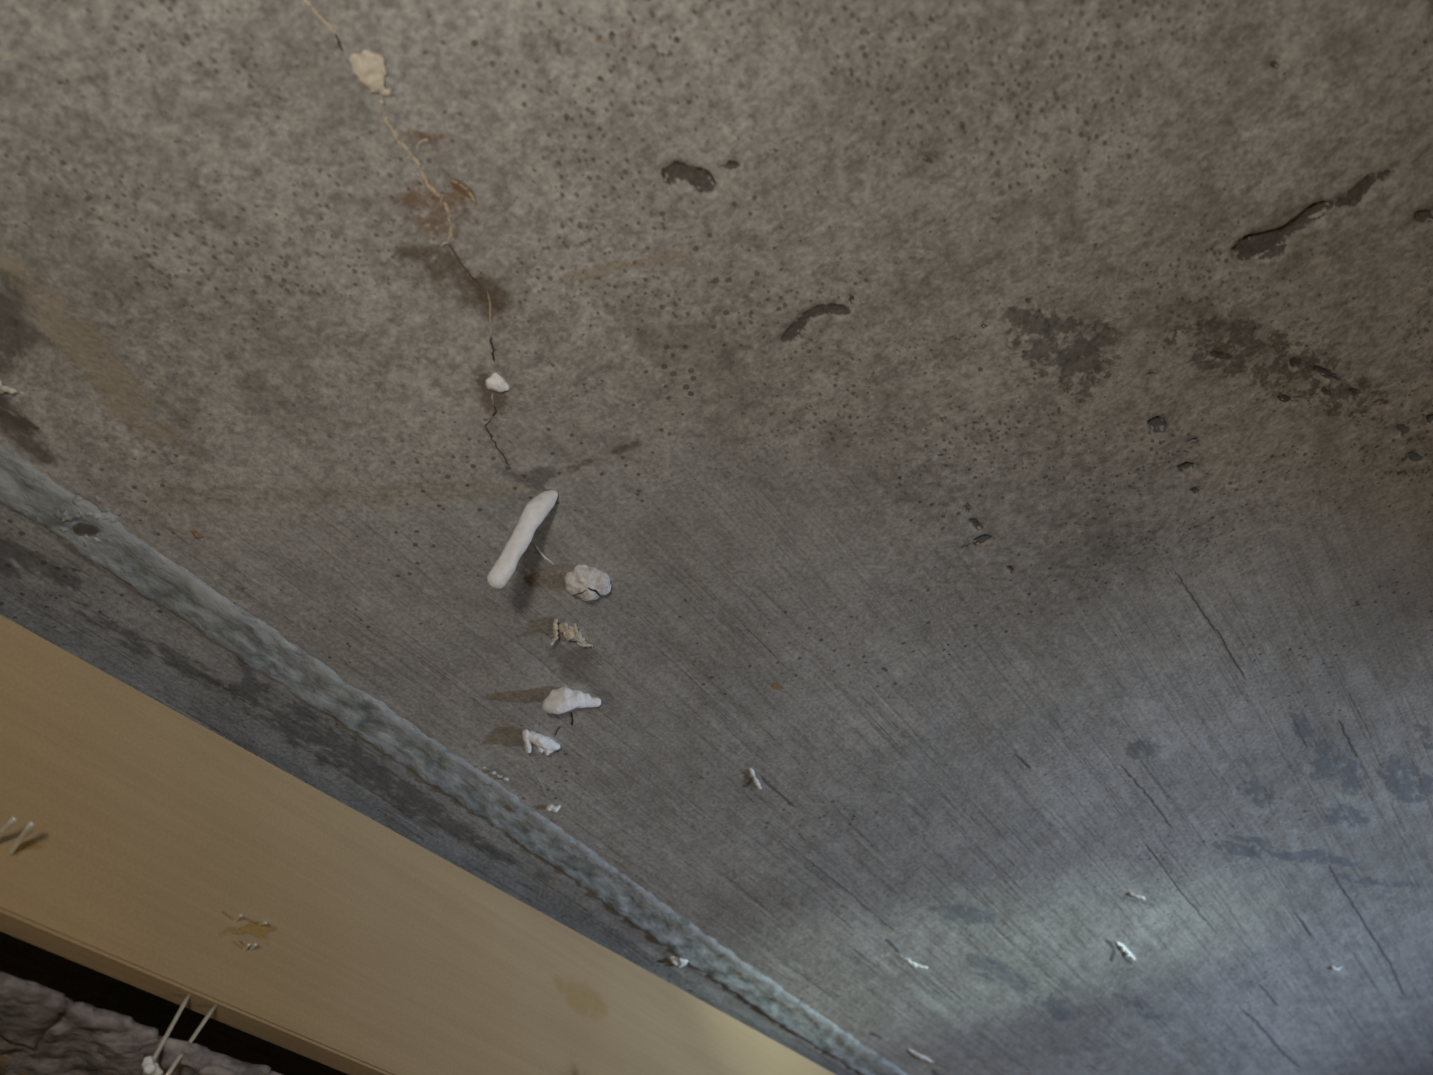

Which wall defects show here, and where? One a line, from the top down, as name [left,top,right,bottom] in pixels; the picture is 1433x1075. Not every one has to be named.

crack [383,108,511,468]